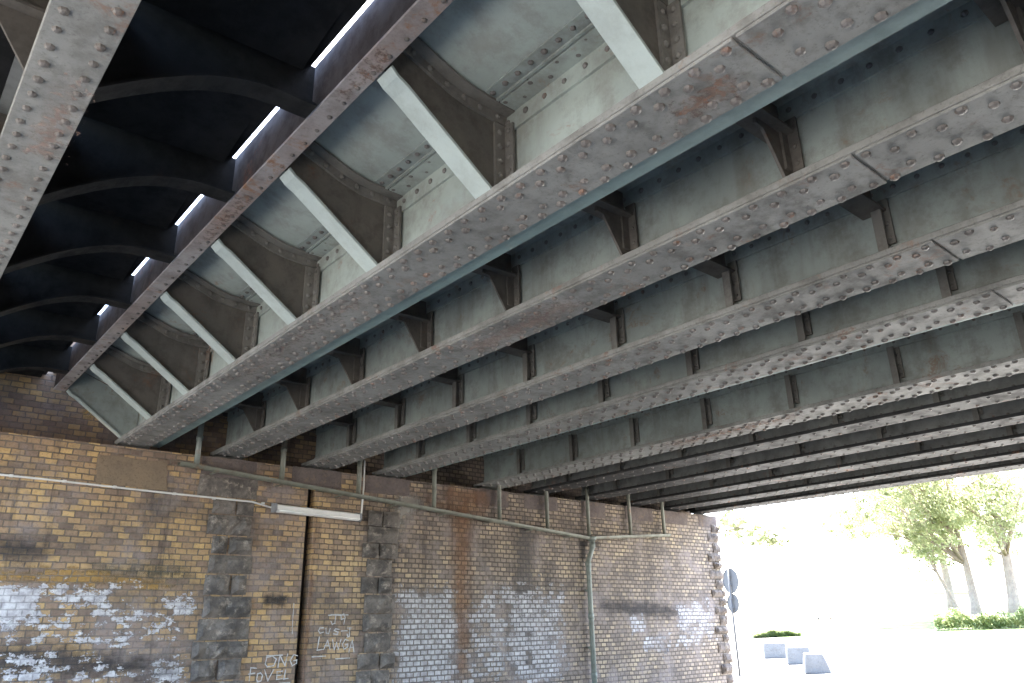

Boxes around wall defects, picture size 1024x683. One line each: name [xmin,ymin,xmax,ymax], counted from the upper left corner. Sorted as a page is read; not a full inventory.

water stain [515,528,534,666]